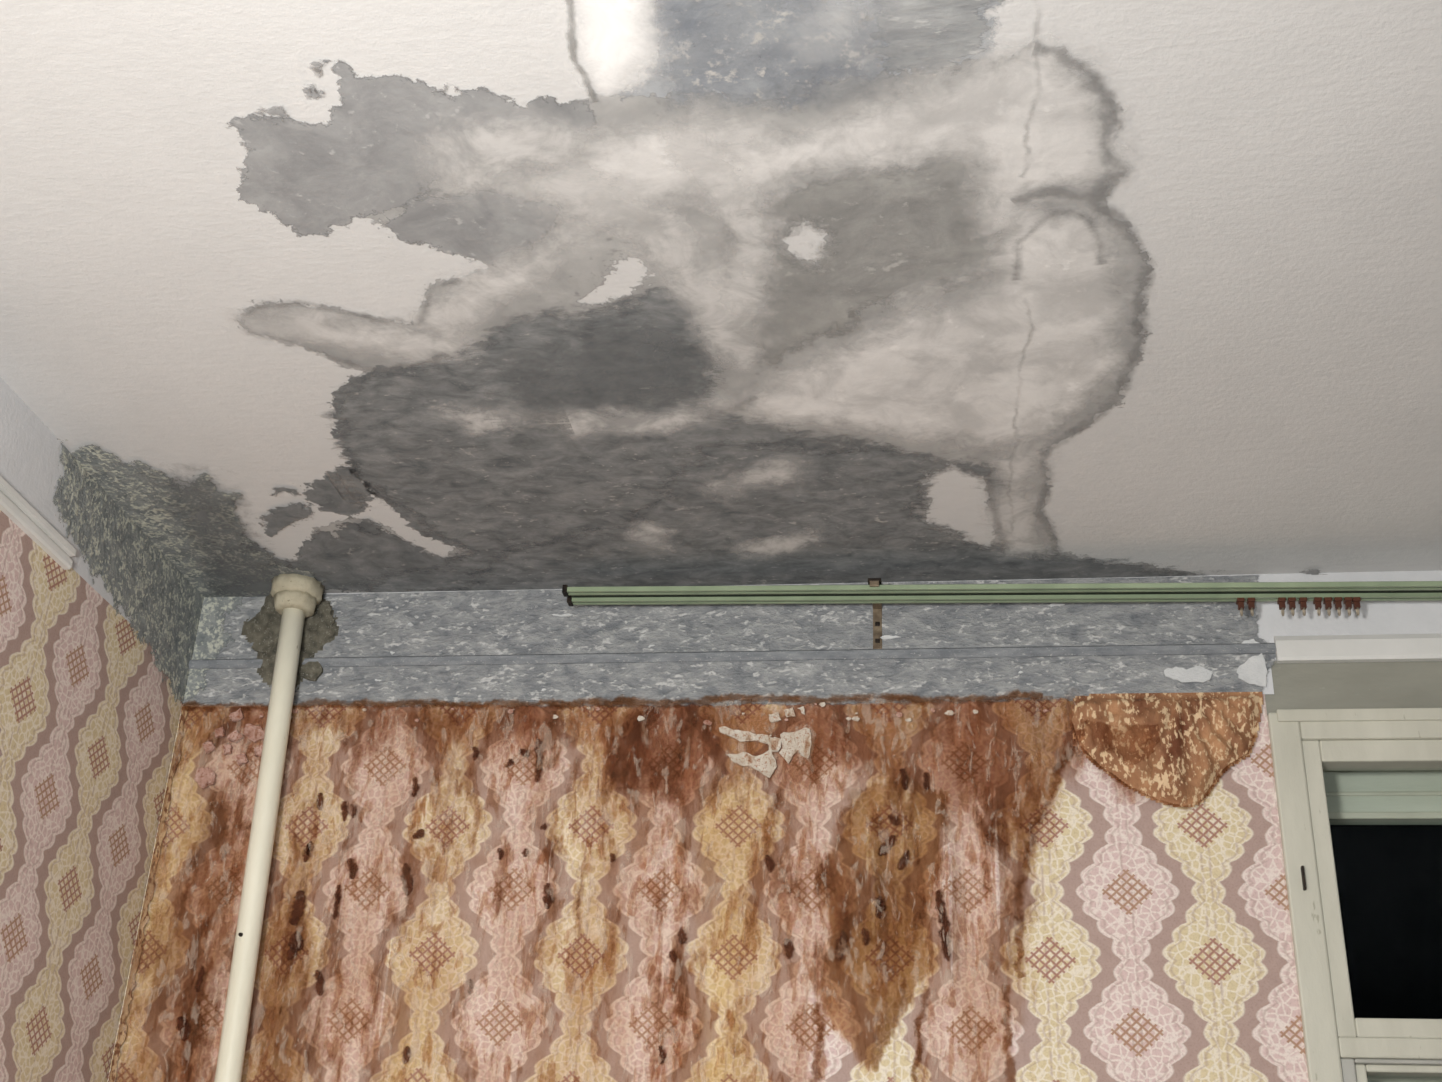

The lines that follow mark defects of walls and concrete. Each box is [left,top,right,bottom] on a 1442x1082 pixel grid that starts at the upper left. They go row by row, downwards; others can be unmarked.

crack [566,0,595,103]
damp [53,0,1206,742]
flaking render [800,575,1258,585]
flaking render [183,594,282,789]
damp [390,697,655,783]
flaking render [293,590,1276,778]
damp [787,696,873,752]
damp [884,691,1048,829]
damp [165,976,218,1046]
damp [913,1017,922,1081]